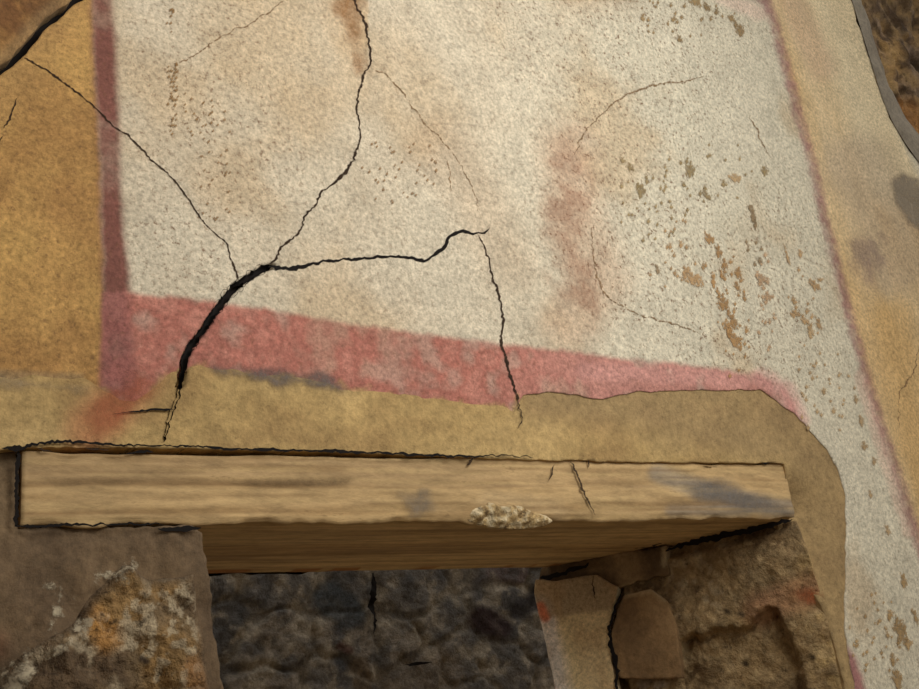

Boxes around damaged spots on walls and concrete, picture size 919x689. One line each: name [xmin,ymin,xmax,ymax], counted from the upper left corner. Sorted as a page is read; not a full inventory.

peeling [667,0,745,42]
flaking render [851,0,919,162]
crack [0,0,532,532]
peeling [620,157,776,358]
peeling [784,246,860,418]
crack [549,460,595,514]
crack [540,562,622,689]
peeling [852,592,919,689]